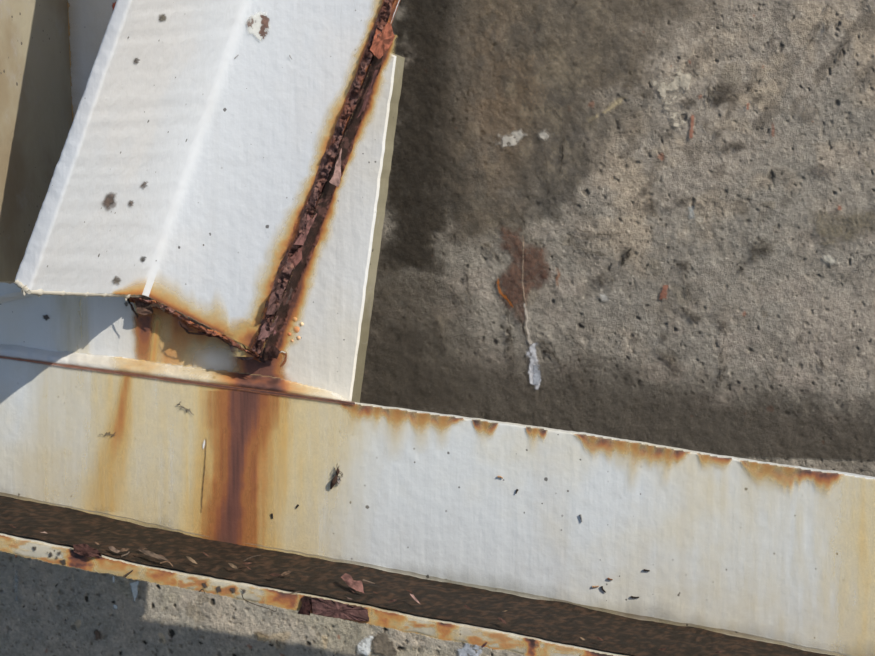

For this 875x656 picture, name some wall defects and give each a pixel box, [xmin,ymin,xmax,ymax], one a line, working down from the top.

water stain [360,0,875,460]
rust [81,0,397,557]
rust [497,227,560,322]
rust [338,403,498,434]
rust [526,427,547,438]
rust [574,434,843,489]
rust [0,535,31,553]
rust [32,543,240,597]
rust [250,587,459,641]
rust [467,631,613,656]